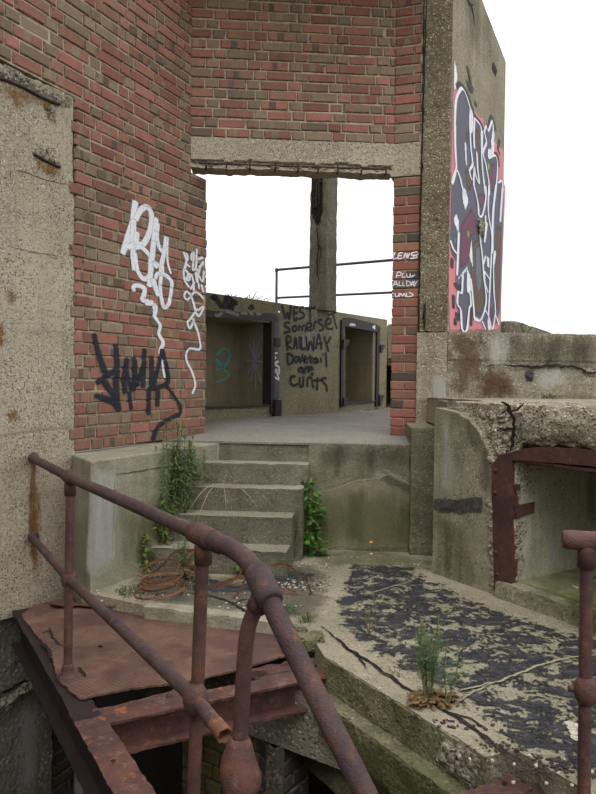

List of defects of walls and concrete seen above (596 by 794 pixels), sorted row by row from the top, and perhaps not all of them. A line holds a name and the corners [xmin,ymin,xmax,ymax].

spalling [194,161,392,224]
crack [315,222,323,281]
crack [485,357,596,374]
crack [497,402,524,452]
rust [29,463,39,563]
crack [454,654,596,703]